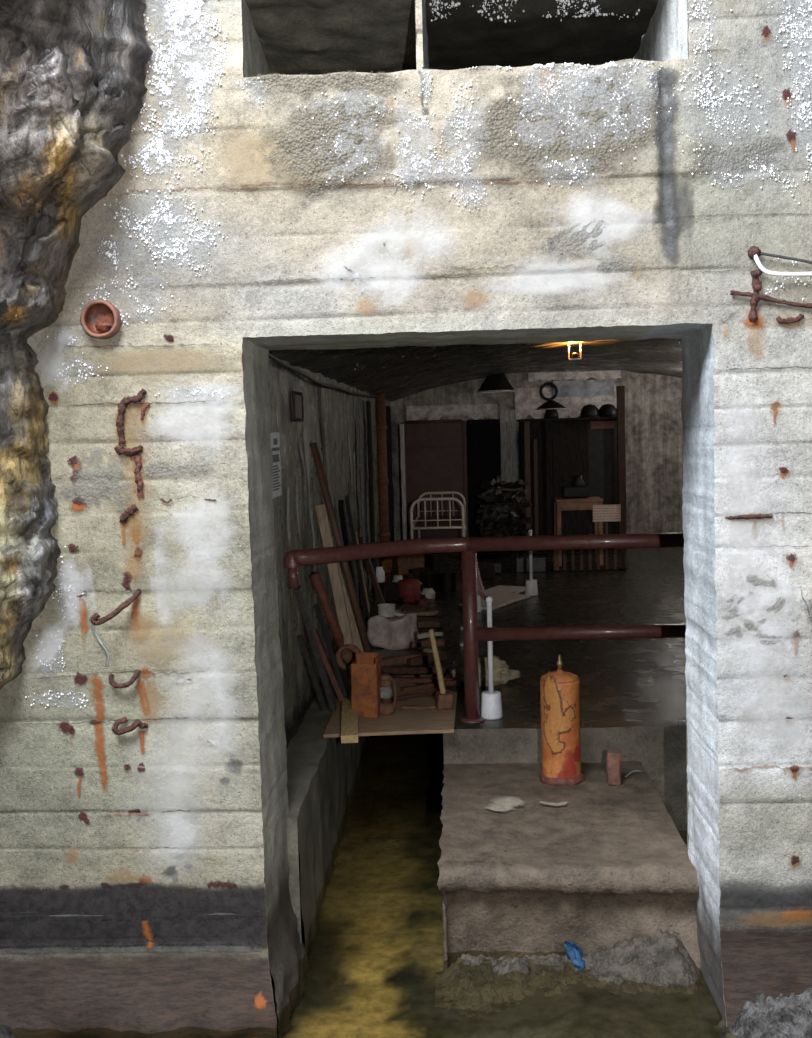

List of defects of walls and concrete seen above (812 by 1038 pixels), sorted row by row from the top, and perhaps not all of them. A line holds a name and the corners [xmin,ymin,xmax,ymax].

water stain [429,0,525,23]
water stain [494,0,812,263]
water stain [75,0,228,326]
rust [67,455,86,510]
rust [122,524,142,562]
rust [76,591,87,632]
rust [121,572,139,629]
rust [137,668,155,714]
rust [59,721,75,735]
rust [74,672,107,788]
water stain [0,883,277,1038]
rust [142,921,153,948]